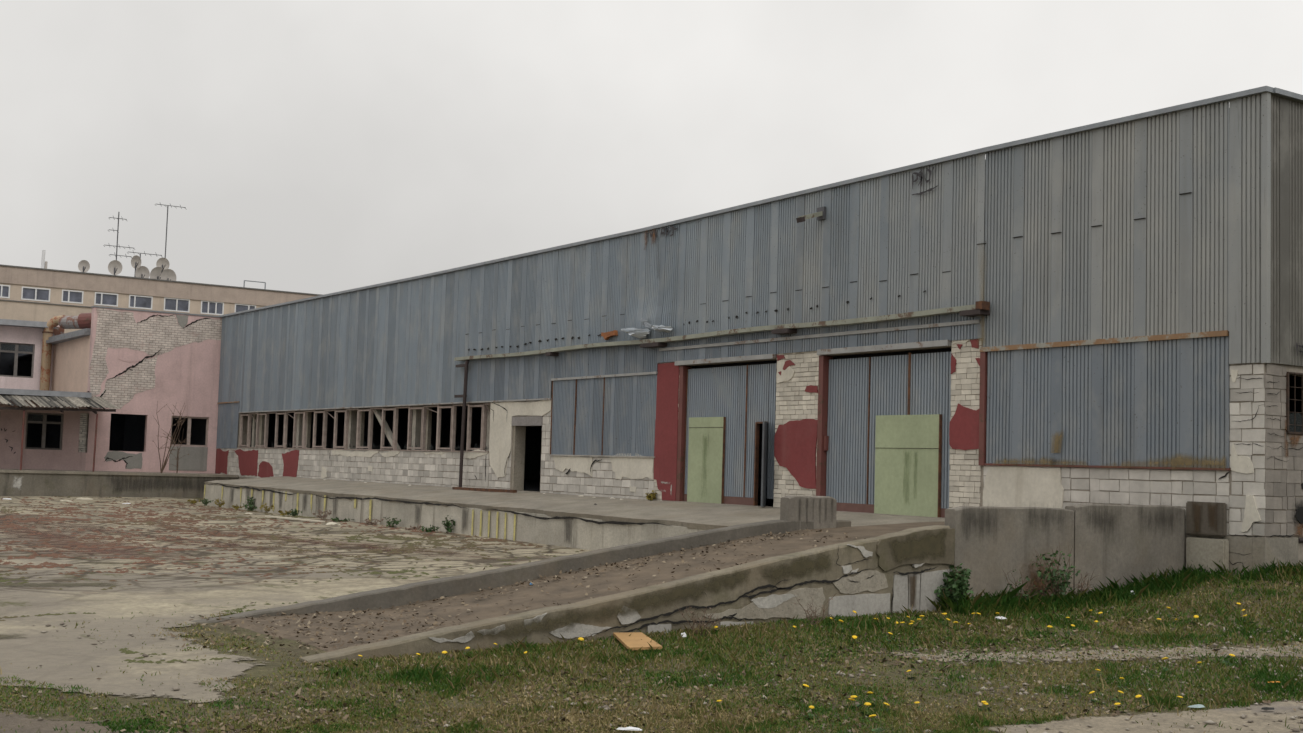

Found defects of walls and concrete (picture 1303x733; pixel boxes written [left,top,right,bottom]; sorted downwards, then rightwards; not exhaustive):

peeling [89,308,222,396]
peeling [215,449,300,478]
peeling [321,450,400,479]
peeling [465,400,551,478]
peeling [774,419,818,489]
peeling [949,403,979,450]
crack [592,545,936,637]